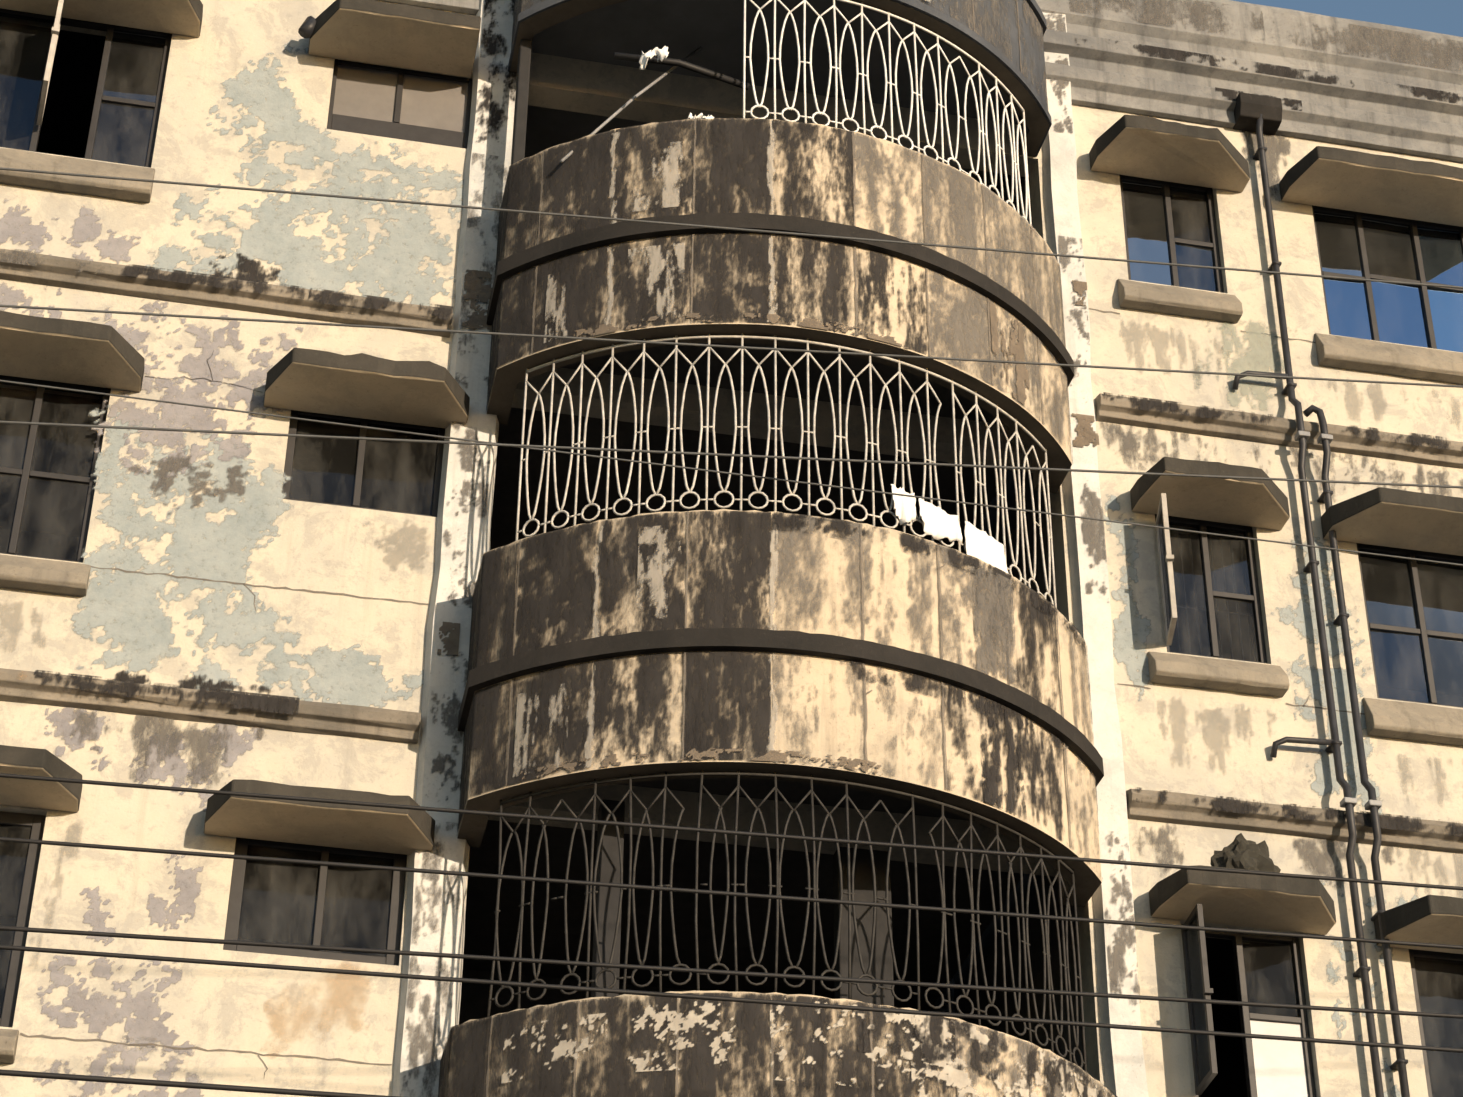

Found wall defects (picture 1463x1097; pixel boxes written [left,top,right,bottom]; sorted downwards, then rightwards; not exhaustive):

peeling [0,43,492,332]
water stain [121,0,1090,443]
water stain [1101,322,1285,466]
peeling [71,300,424,708]
crack [91,566,429,610]
water stain [34,670,300,784]
water stain [403,511,1118,1097]
water stain [1195,796,1463,888]
peeling [34,886,203,1097]
crack [20,1033,392,1077]
peeling [628,1001,736,1072]
peeling [770,1001,1107,1097]